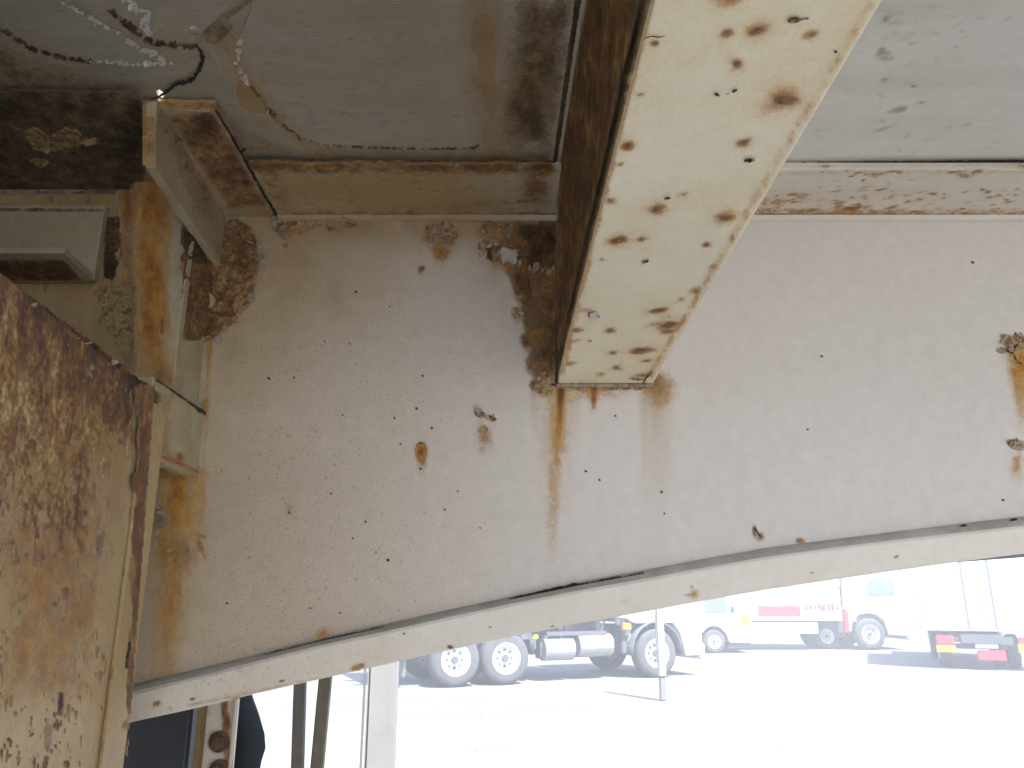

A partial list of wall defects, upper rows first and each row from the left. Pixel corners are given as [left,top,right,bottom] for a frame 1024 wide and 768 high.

peeling [62,0,173,68]
corrosion [747,24,768,36]
crack [150,48,205,100]
water stain [465,0,569,160]
corrosion [770,89,810,109]
corrosion [650,204,665,215]
corrosion [717,171,1016,222]
peeling [478,221,520,267]
corrosion [631,264,717,407]
peeling [997,332,1024,364]
corrosion [0,0,646,768]
peeling [474,408,497,441]